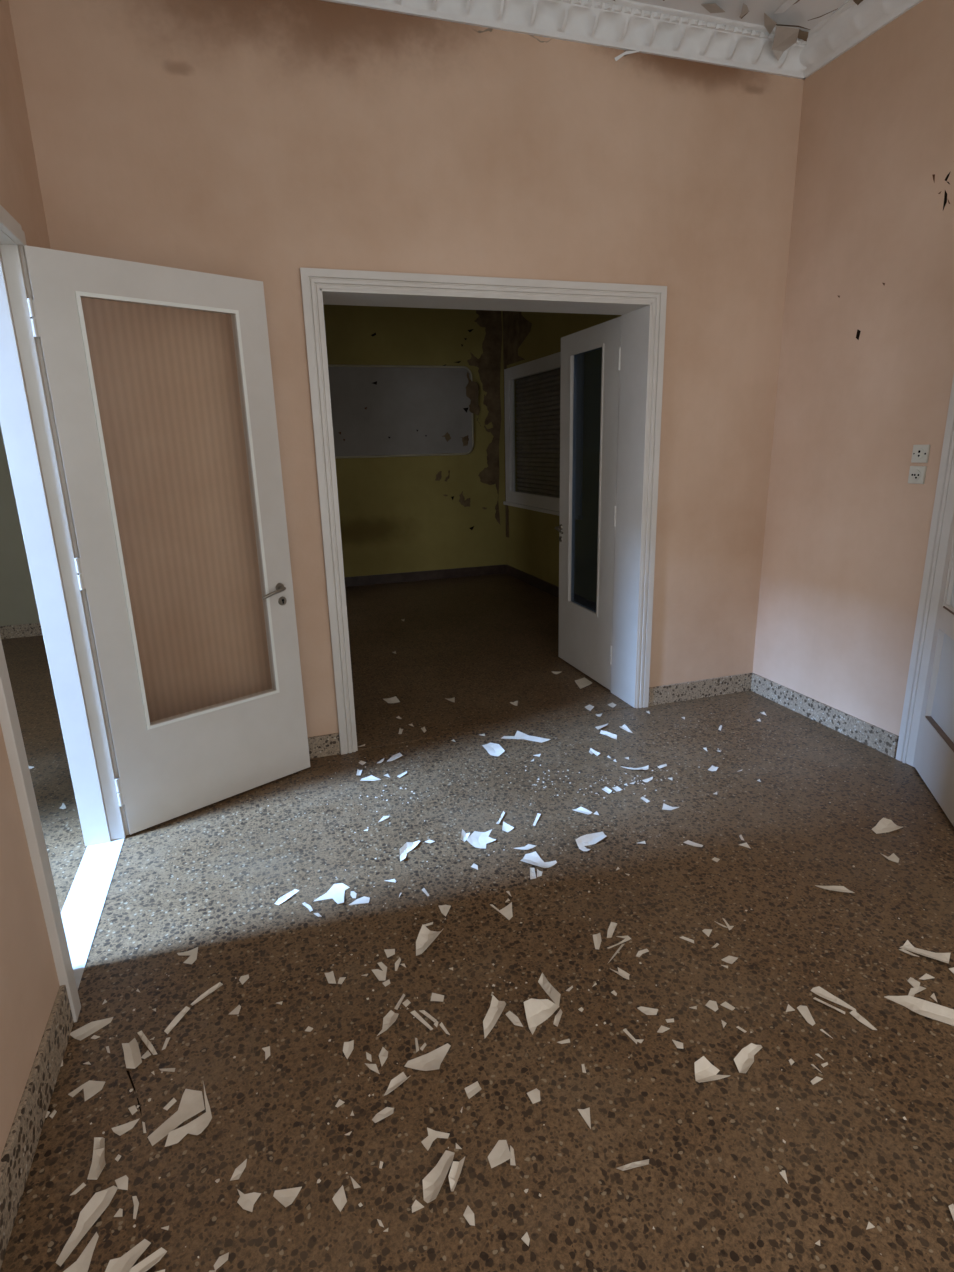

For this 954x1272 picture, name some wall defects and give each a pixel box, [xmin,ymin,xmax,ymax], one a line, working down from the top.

peeling [701,3,725,13]
peeling [764,13,810,61]